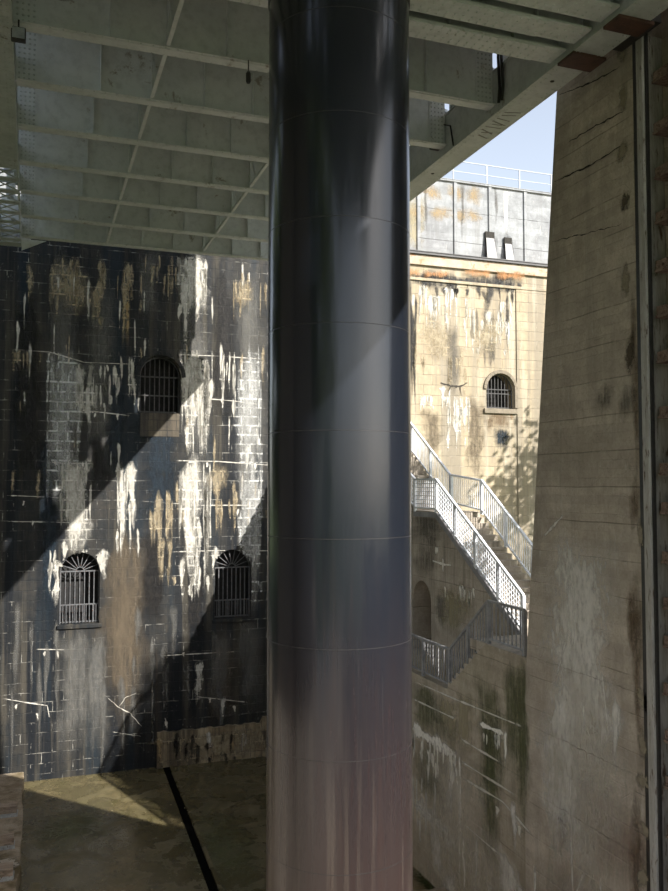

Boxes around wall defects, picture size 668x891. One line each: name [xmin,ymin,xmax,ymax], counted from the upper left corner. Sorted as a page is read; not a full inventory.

crack [557,146,620,181]
crack [560,66,620,95]
crack [569,112,622,142]
water stain [410,272,521,470]
rust [465,270,520,279]
water stain [11,255,267,764]
water stain [412,672,531,891]
water stain [544,684,584,891]